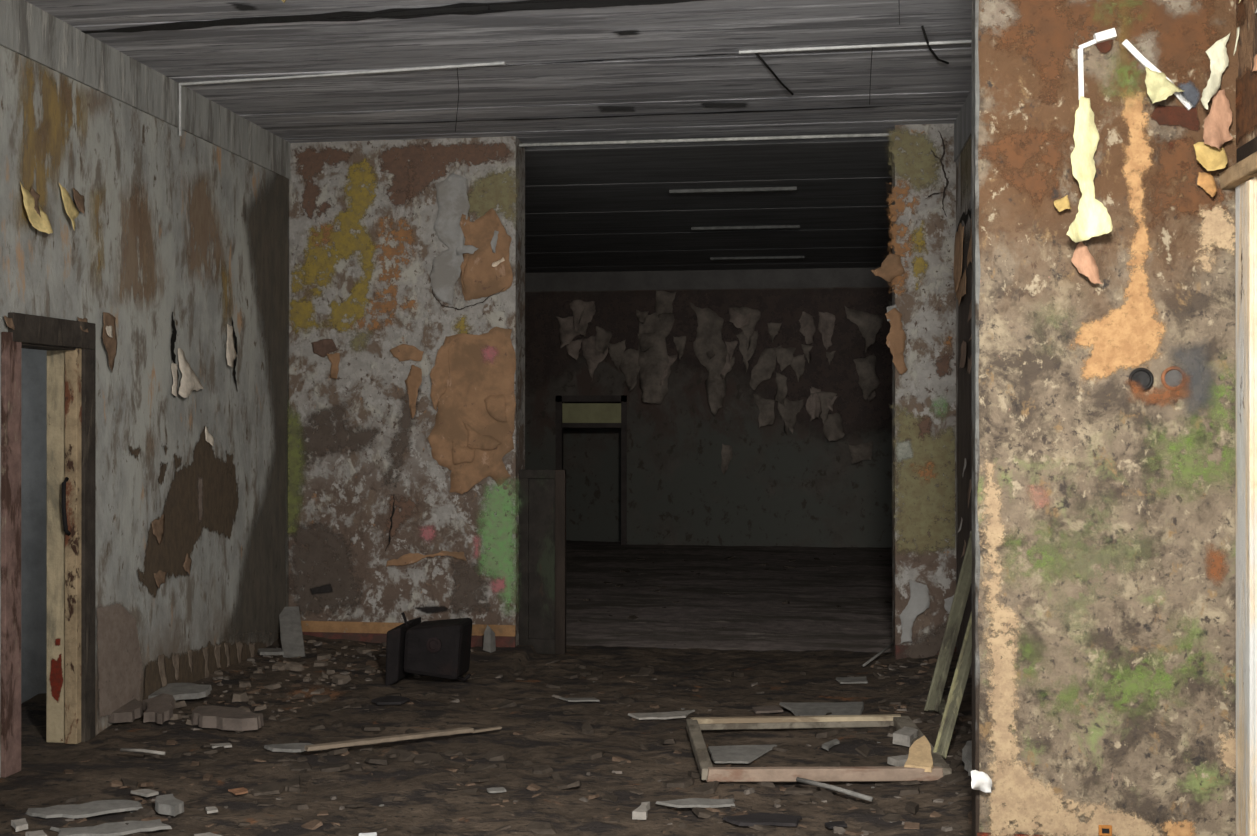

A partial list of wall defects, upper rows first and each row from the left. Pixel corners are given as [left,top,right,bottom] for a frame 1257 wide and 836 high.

crack [81,0,703,34]
peeling [292,146,353,247]
peeling [379,140,511,206]
peeling [979,0,1236,272]
peeling [1236,69,1257,145]
peeling [460,208,513,301]
peeling [871,221,928,290]
peeling [885,304,908,375]
peeling [129,426,239,597]
peeling [384,327,516,615]
peeling [958,458,1195,836]
damp [1059,631,1209,711]